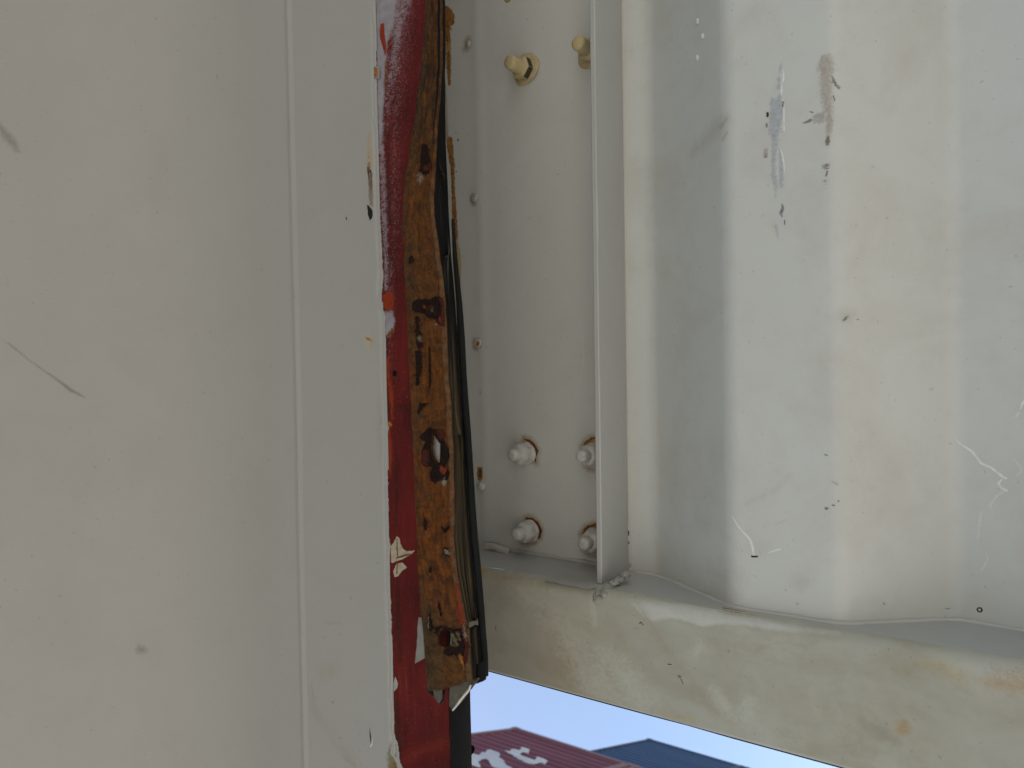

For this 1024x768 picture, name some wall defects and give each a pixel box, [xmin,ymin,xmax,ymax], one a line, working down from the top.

rust [417,143,432,185]
rust [445,4,462,304]
peeling [764,59,786,242]
peeling [363,0,445,746]
rust [503,431,544,487]
rust [575,430,596,476]
rust [516,509,548,551]
rust [575,516,597,562]